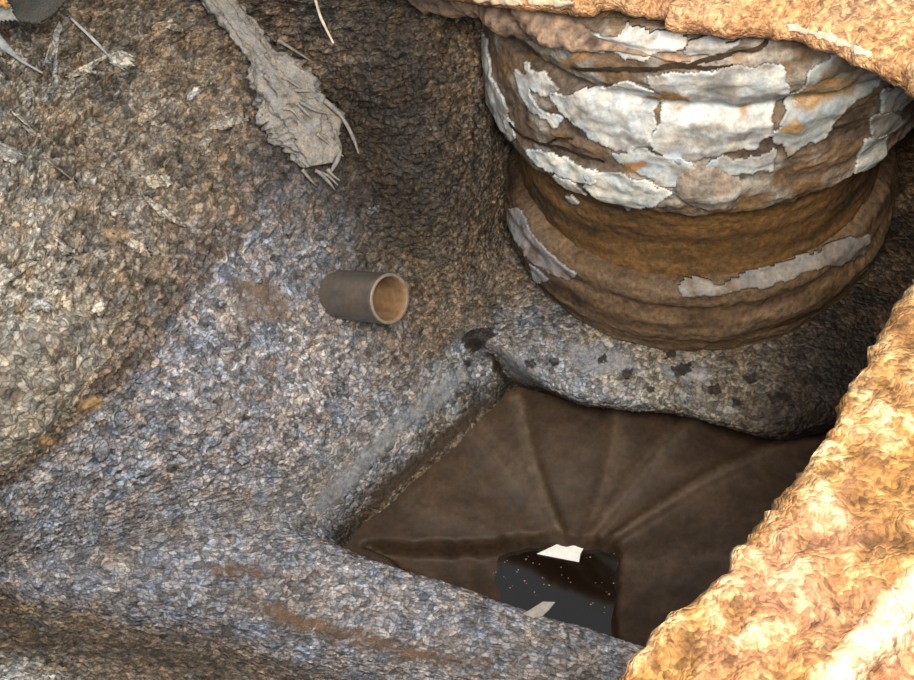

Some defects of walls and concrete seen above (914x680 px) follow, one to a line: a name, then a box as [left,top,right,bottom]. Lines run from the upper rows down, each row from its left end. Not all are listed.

peeling [481,31,517,142]
peeling [513,20,914,211]
rust [625,162,646,171]
peeling [506,206,577,284]
peeling [677,233,871,298]